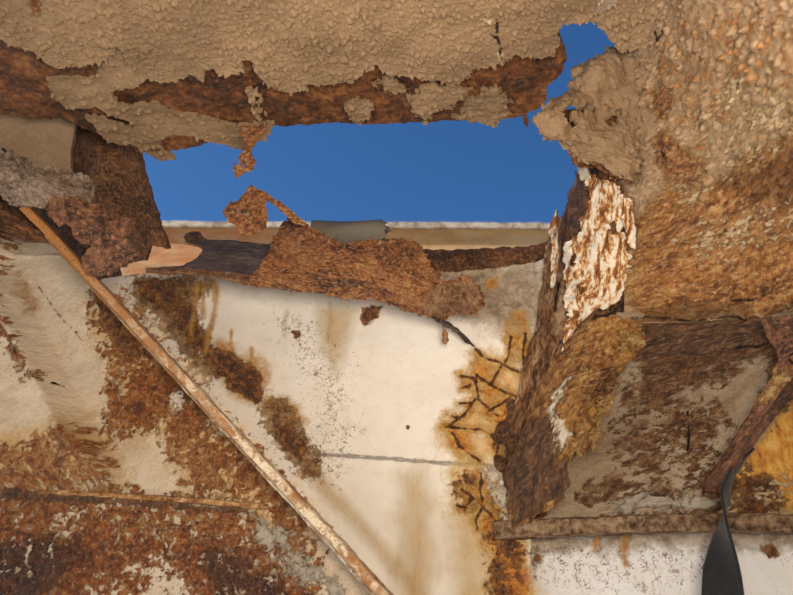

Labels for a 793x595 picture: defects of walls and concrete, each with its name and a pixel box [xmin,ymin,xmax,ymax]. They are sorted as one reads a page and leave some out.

corrosion [0,40,133,133]
corrosion [0,195,328,595]
corrosion [222,185,306,238]
corrosion [113,32,567,178]
crack [440,332,529,532]
peeling [531,46,642,351]
corrosion [440,0,793,595]